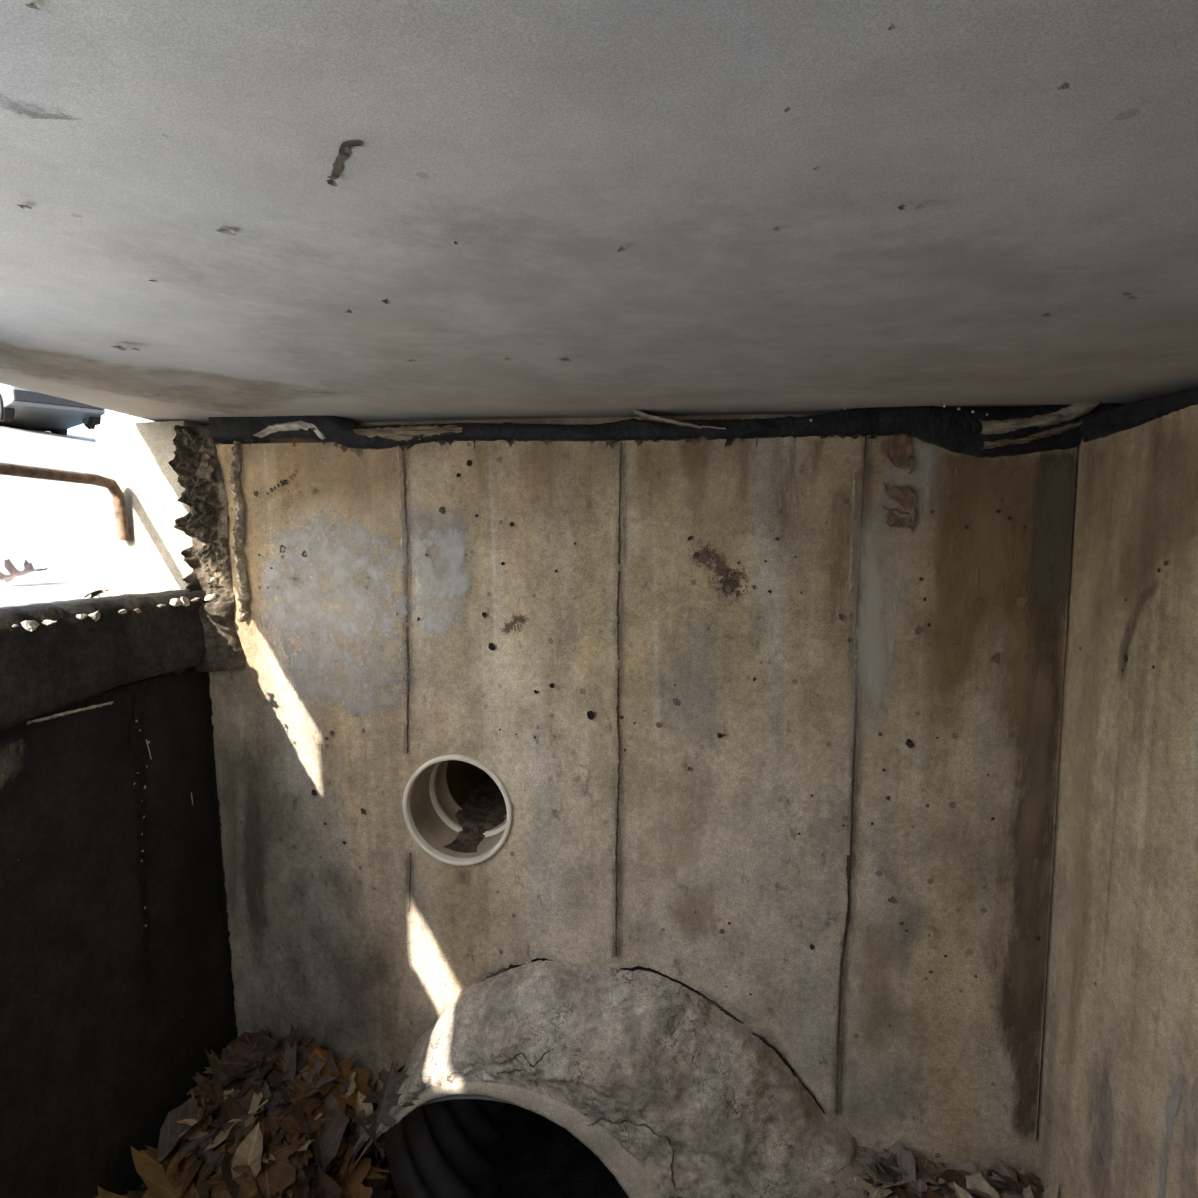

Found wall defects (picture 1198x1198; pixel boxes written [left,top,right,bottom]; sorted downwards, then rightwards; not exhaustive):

crack [611,436,869,1115]
leakage [936,454,1077,1137]
crack [480,958,553,982]
crack [498,1049,553,1074]
crack [587,1118,683,1198]